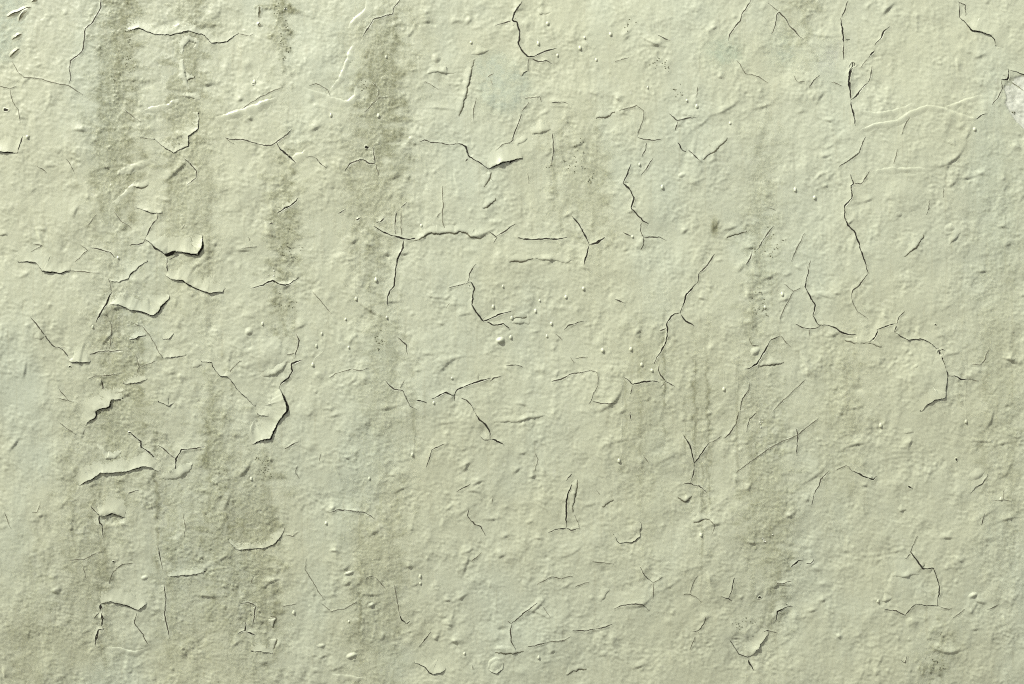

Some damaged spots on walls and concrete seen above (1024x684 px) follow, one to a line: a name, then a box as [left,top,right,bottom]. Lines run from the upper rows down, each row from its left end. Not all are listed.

crack [419,0,569,184]
spalling [991,64,1024,128]
peeling [485,144,523,168]
crack [488,85,702,267]
peeling [110,202,226,316]
crack [337,202,419,307]
crack [448,262,512,332]
crack [680,0,911,494]
peeling [201,333,304,444]
crack [329,362,524,449]
peeling [74,452,163,486]
peeling [228,527,299,550]